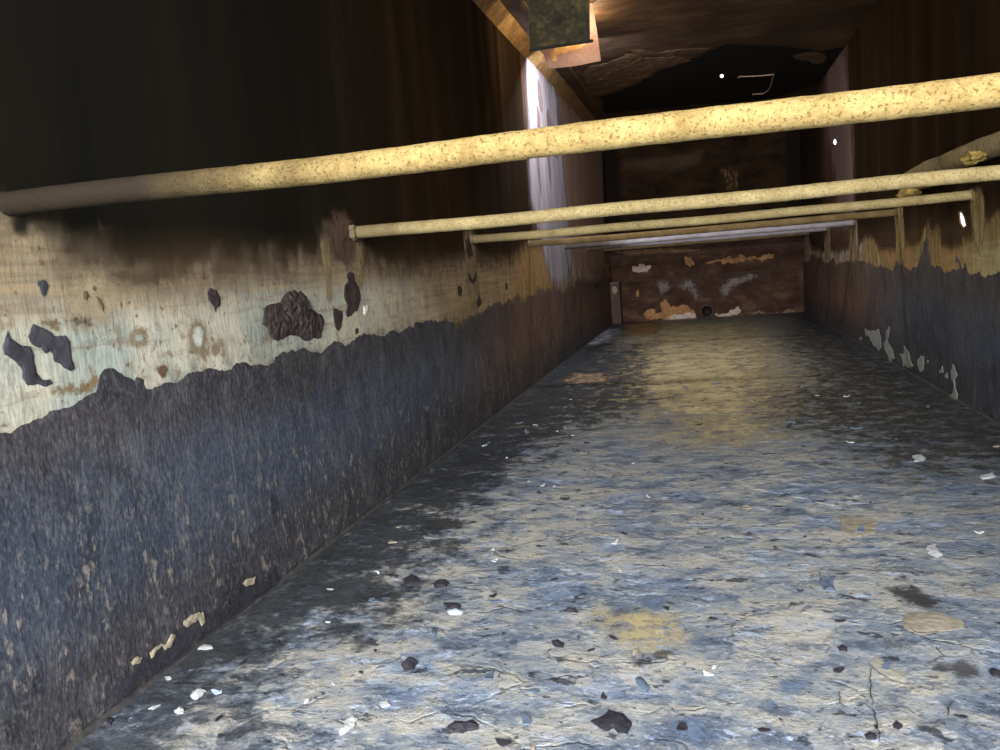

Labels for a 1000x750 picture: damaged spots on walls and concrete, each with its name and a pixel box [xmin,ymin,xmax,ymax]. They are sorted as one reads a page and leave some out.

water stain [802,193,1000,277]
peeling [3,324,75,387]
peeling [207,288,221,313]
water stain [0,215,611,433]
peeling [333,271,369,331]
peeling [859,327,928,372]
peeling [939,364,958,400]
water stain [413,519,461,530]